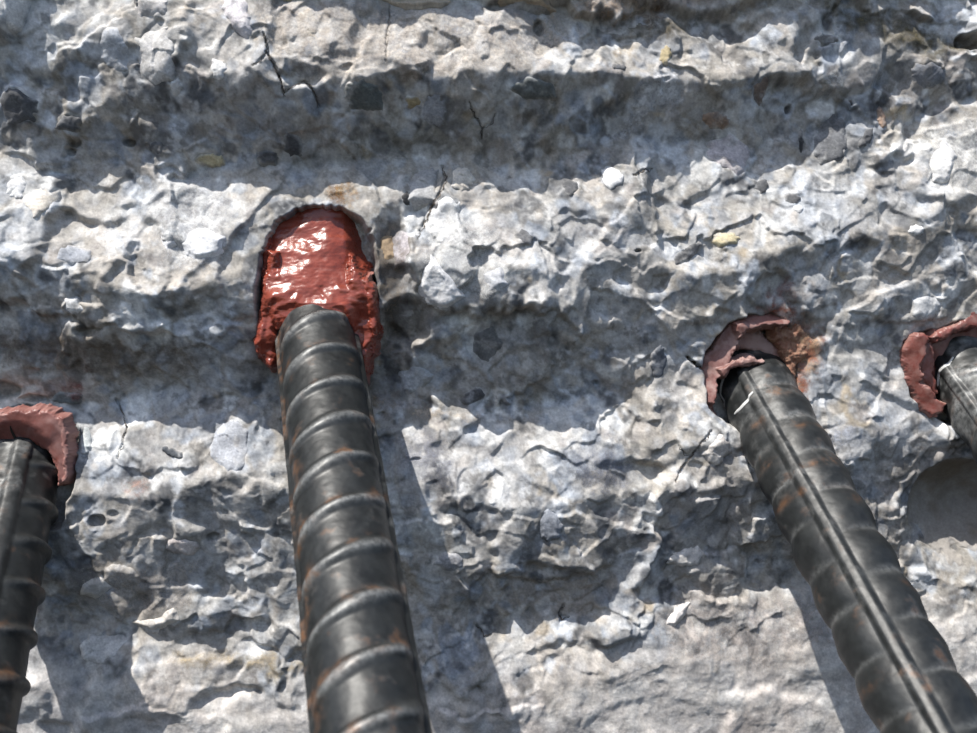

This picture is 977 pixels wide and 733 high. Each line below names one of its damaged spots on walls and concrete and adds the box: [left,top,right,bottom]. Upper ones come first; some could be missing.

rust [768,283,821,392]